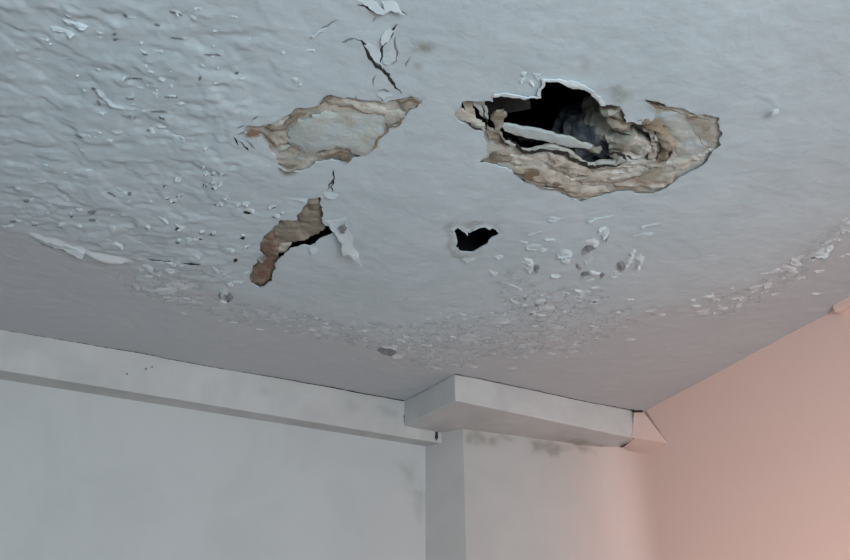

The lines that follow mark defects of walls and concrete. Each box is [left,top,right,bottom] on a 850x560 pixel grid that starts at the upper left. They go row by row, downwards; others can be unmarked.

peeling [357,0,407,21]
crack [343,25,402,102]
spalling [245,95,421,173]
spalling [461,71,591,148]
spalling [117,195,362,304]
spalling [454,227,498,251]
peeling [487,215,646,330]
peeling [689,217,850,316]
spalling [377,345,405,359]